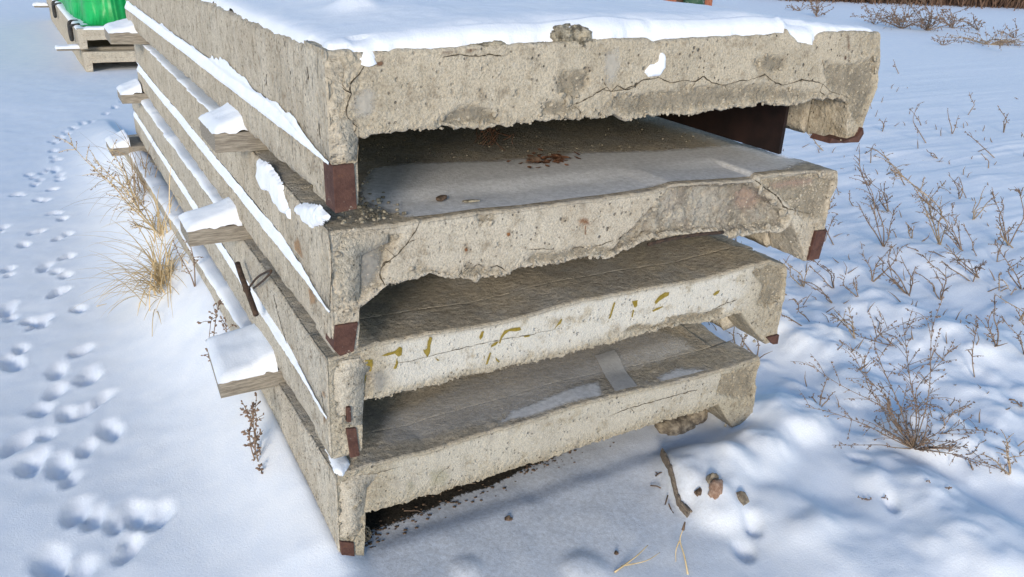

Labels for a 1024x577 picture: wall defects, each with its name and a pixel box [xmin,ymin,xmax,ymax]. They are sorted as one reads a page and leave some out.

crack [342,67,364,132]
crack [564,74,846,112]
crack [755,180,811,215]
crack [379,224,419,285]
rust [235,261,272,317]